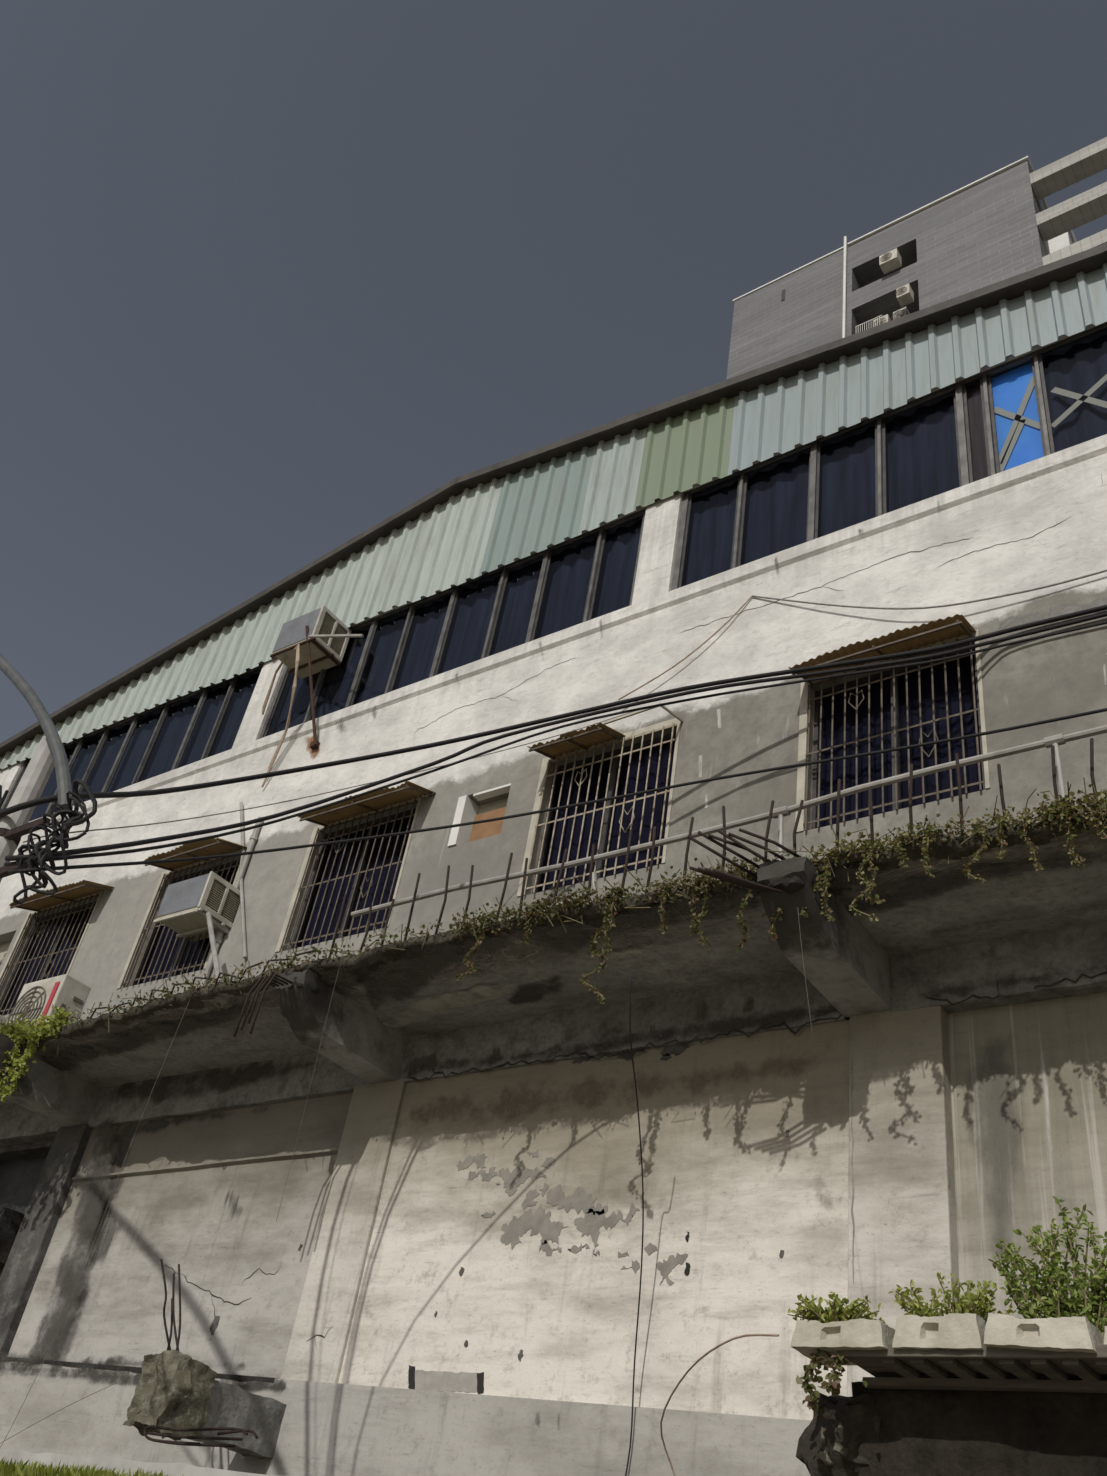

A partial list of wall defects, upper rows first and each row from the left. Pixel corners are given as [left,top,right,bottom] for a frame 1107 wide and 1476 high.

crack [923,966,1107,1005]
water stain [1042,1064,1050,1130]
water stain [984,1048,1016,1239]
peeling [457,1150,640,1257]
crack [159,1264,281,1316]
peeling [618,1232,691,1285]